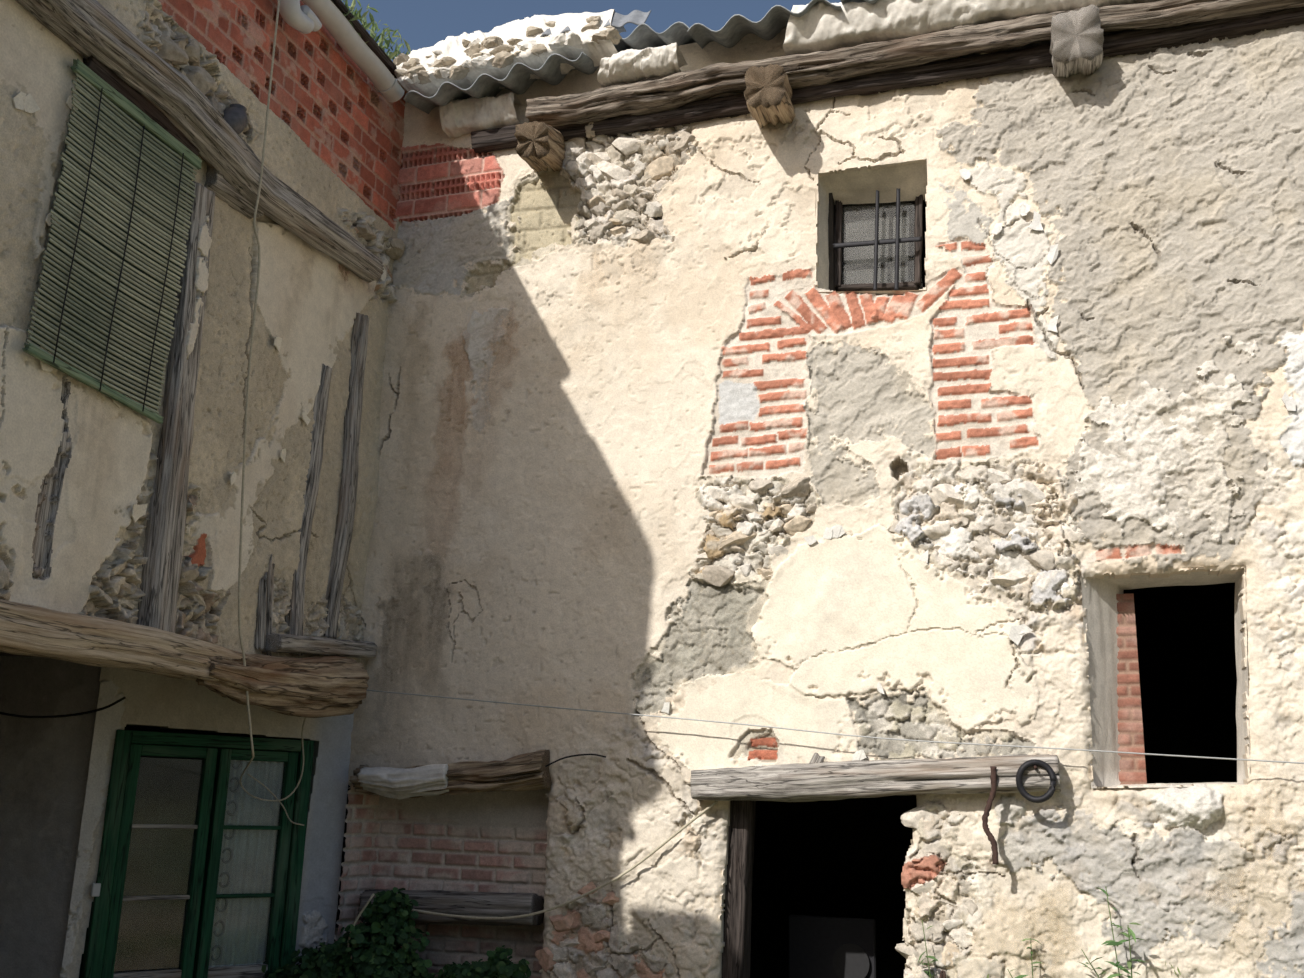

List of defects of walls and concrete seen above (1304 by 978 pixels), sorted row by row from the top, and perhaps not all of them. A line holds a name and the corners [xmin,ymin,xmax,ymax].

peeling [0,325,158,624]
peeling [175,206,397,644]
crack [447,579,483,659]
spalling [395,124,701,433]
crack [805,97,906,180]
crack [795,552,1027,688]
peeling [631,160,1260,770]